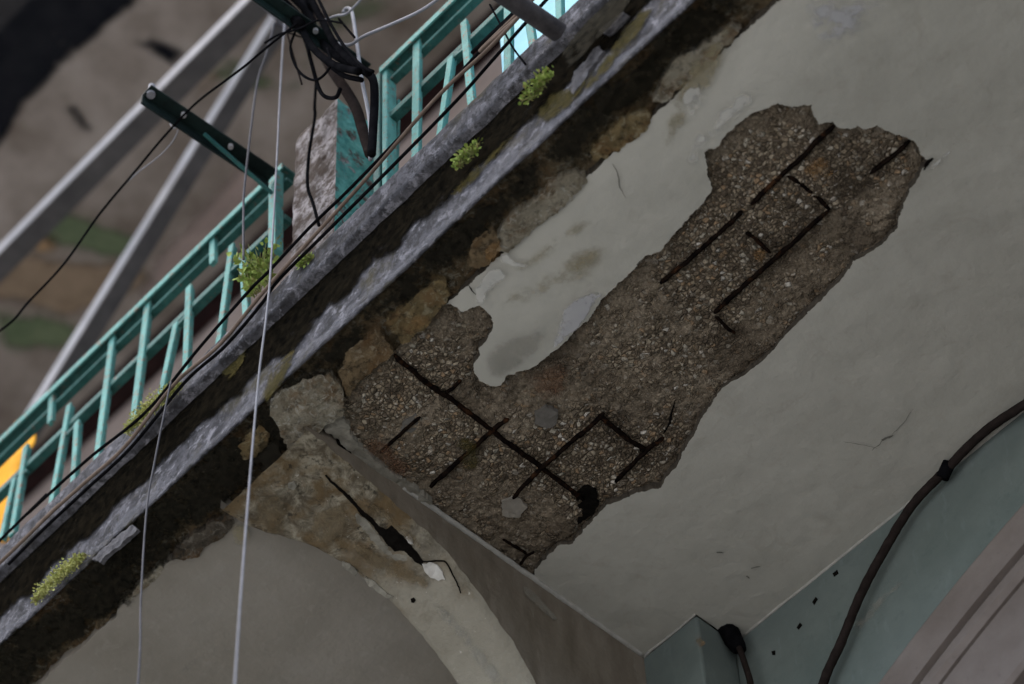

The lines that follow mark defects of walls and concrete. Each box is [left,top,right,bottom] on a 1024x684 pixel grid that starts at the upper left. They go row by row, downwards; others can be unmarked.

spalling [323,103,924,574]
flaking render [92,525,141,565]
crack [325,475,461,593]
flaking render [422,562,445,581]